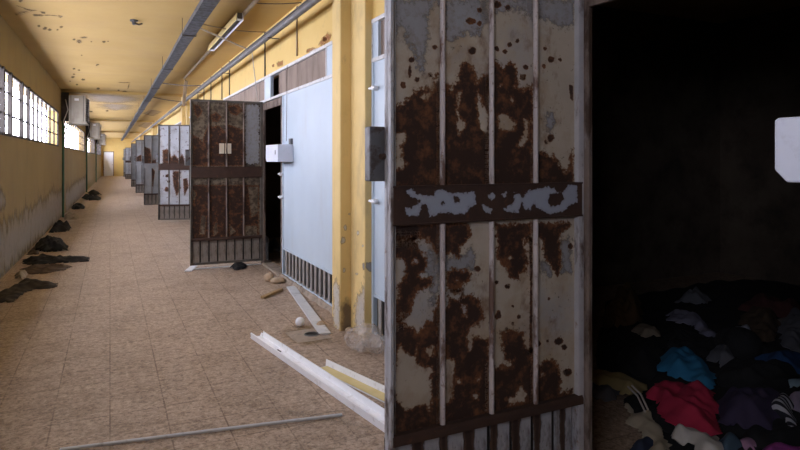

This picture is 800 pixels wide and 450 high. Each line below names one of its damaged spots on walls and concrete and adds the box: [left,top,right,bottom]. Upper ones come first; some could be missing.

corrosion [396,38,575,186]
corrosion [137,104,259,239]
peeling [333,268,345,330]
peeling [354,285,365,337]
corrosion [396,220,573,433]
corrosion [439,436,448,450]
corrosion [463,429,475,450]
corrosion [489,424,498,450]
corrosion [511,419,521,450]
corrosion [532,414,541,450]